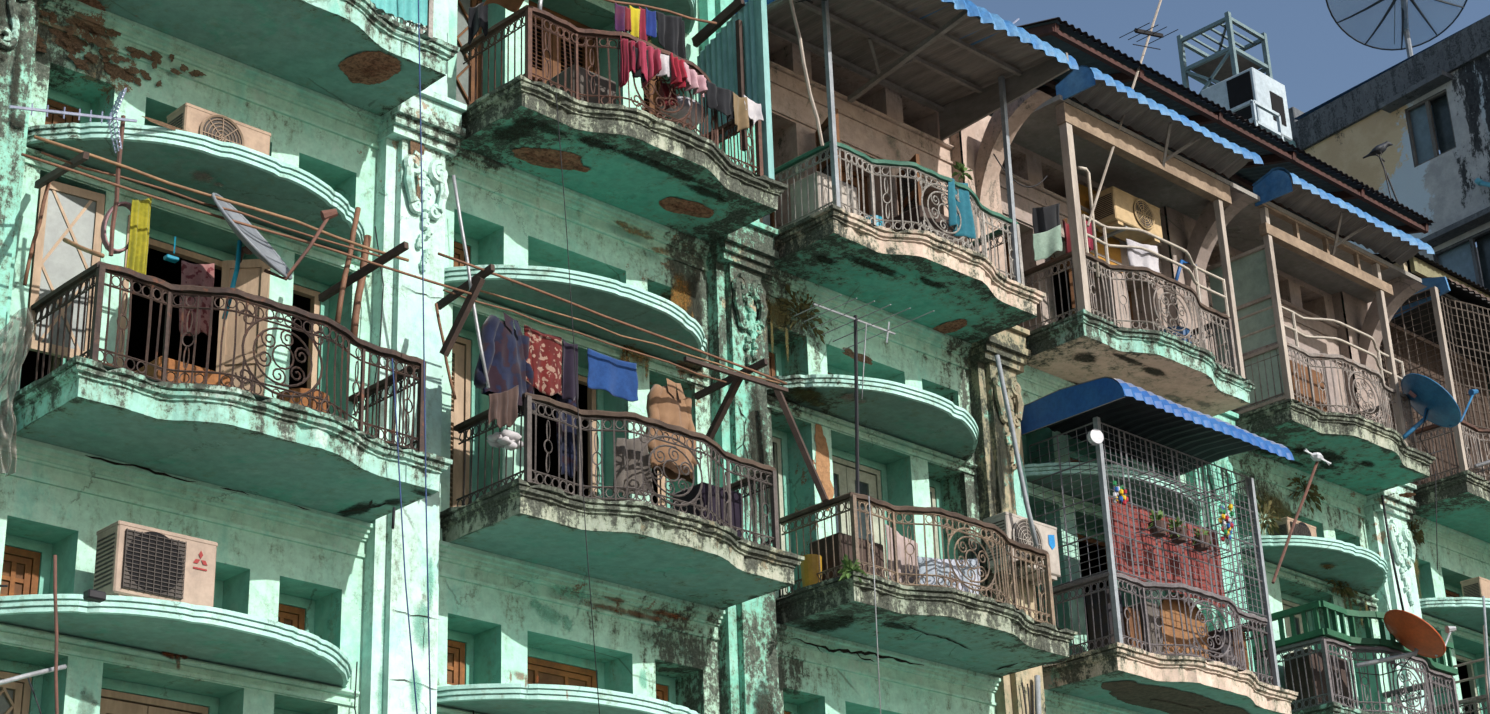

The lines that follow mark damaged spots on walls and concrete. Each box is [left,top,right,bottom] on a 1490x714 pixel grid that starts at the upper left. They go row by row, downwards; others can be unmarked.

peeling [36,0,206,87]
leakage [0,0,29,142]
spalling [338,51,401,85]
spalling [512,147,591,172]
spalling [659,197,715,218]
leakage [686,267,704,326]
crack [85,455,248,495]
leakage [744,387,775,543]
crack [291,501,385,513]
crack [794,623,968,665]
leakage [754,678,776,714]
peeling [1101,681,1249,714]